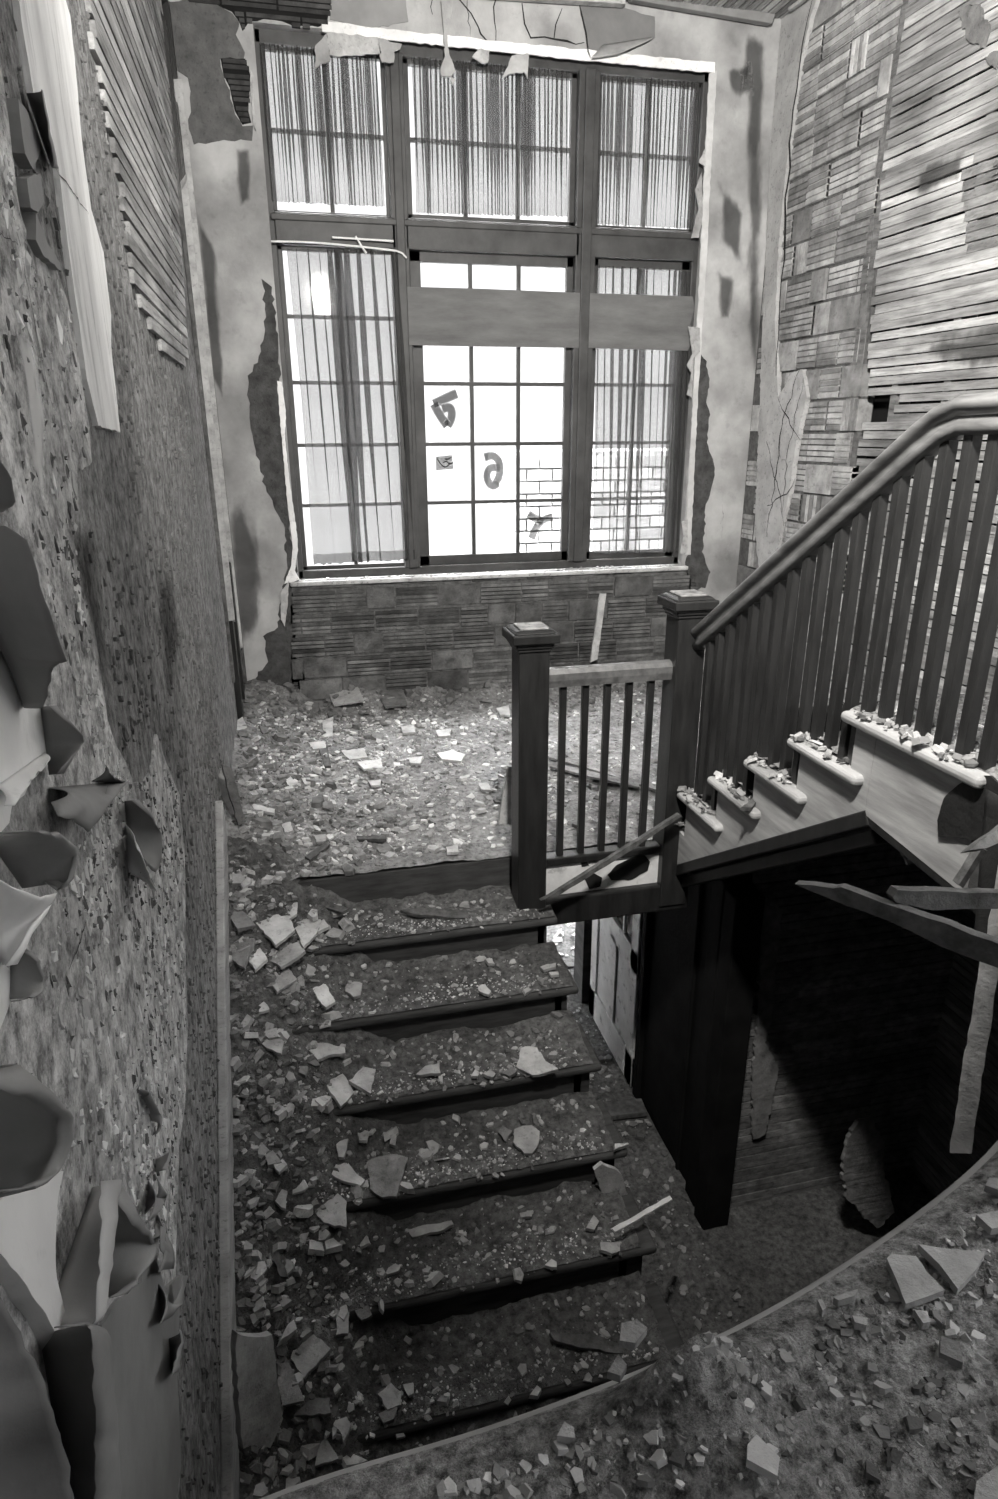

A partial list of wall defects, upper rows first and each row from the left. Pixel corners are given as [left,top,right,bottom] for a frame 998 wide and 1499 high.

spalling [168,0,408,144]
crack [430,0,590,56]
spalling [958,4,998,69]
flaking render [247,279,715,718]
spalling [0,0,279,1499]